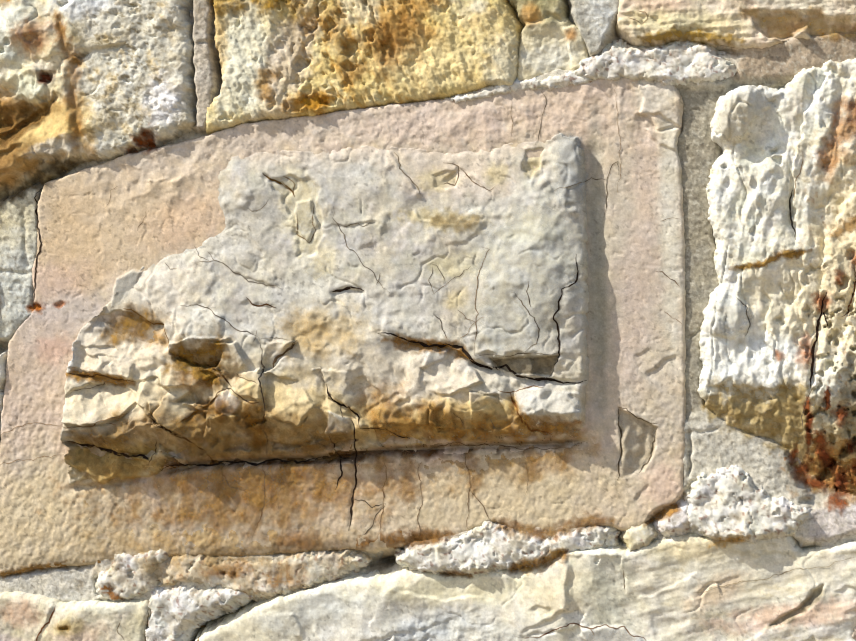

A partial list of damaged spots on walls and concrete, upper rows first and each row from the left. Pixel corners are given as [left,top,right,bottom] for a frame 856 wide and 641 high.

corrosion [38,73,53,84]
corrosion [0,101,50,155]
water stain [0,159,78,206]
corrosion [128,129,156,153]
crack [444,163,493,191]
crack [33,188,42,305]
crack [263,174,390,293]
crack [801,269,856,426]
crack [0,247,587,535]
corrosion [824,386,848,425]
crack [617,407,657,480]
corrosion [784,398,856,512]